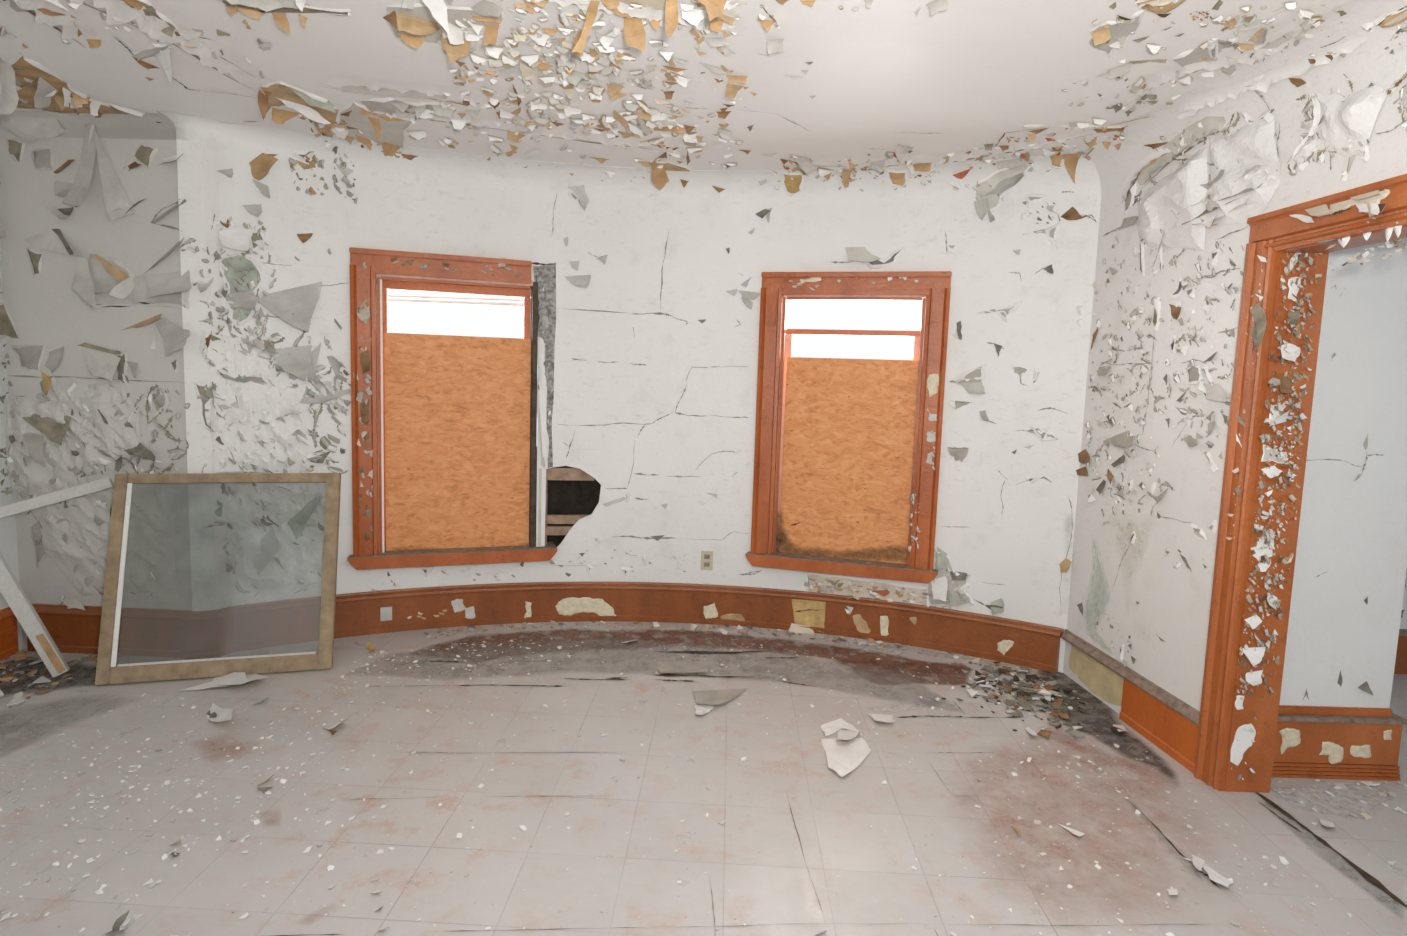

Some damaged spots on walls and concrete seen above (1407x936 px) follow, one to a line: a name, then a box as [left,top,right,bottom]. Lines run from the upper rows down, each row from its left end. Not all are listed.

crack [571,233,741,366]
peeling [0,0,1407,594]
crack [559,366,748,541]
peeling [1069,189,1407,780]
peeling [63,561,107,611]
spalling [407,599,476,619]
spalling [555,597,616,616]
spalling [703,603,745,621]
spalling [788,494,1004,636]
spalling [997,640,1014,655]
peeling [179,672,269,722]
peeling [692,688,748,715]